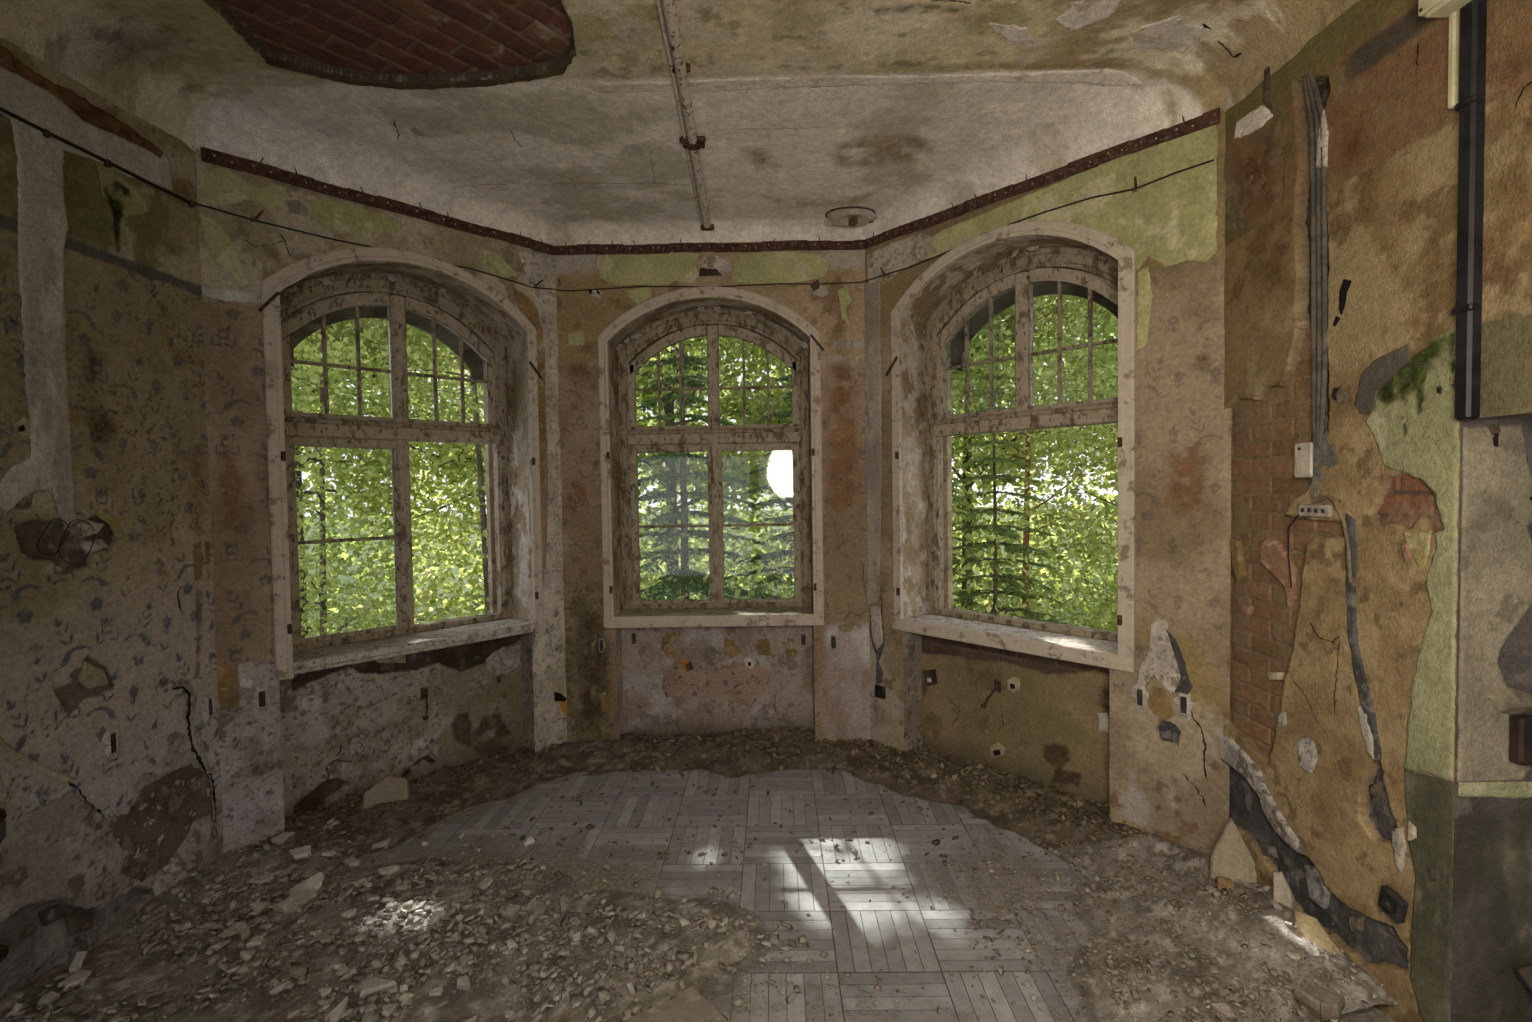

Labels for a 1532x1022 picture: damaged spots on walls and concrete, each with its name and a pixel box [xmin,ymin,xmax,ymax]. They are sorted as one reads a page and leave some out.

spalling [222,0,577,90]
flaking render [1316,78,1330,107]
spalling [1230,187,1352,757]
flaking render [14,517,113,571]
flaking render [53,656,113,716]
crack [172,678,217,818]
peeling [202,664,271,724]
peeling [291,634,521,718]
peeling [1131,683,1194,744]
peeling [1229,325,1532,1022]
spalling [0,764,218,1001]